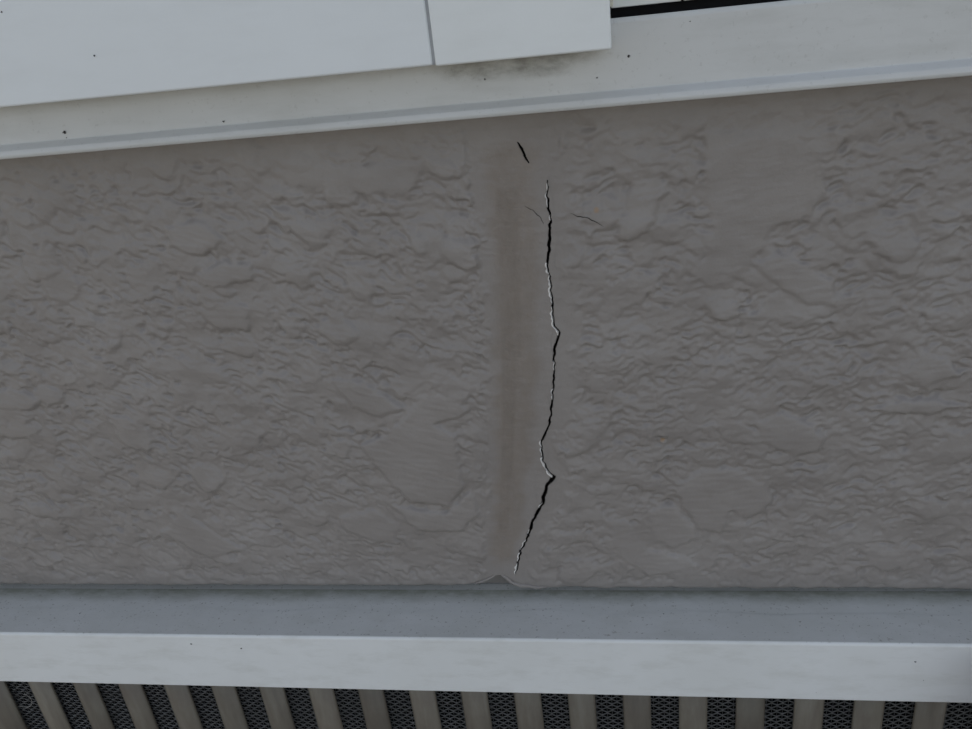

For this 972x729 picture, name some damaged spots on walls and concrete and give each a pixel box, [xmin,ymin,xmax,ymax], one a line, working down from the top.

crack [514,180,602,574]